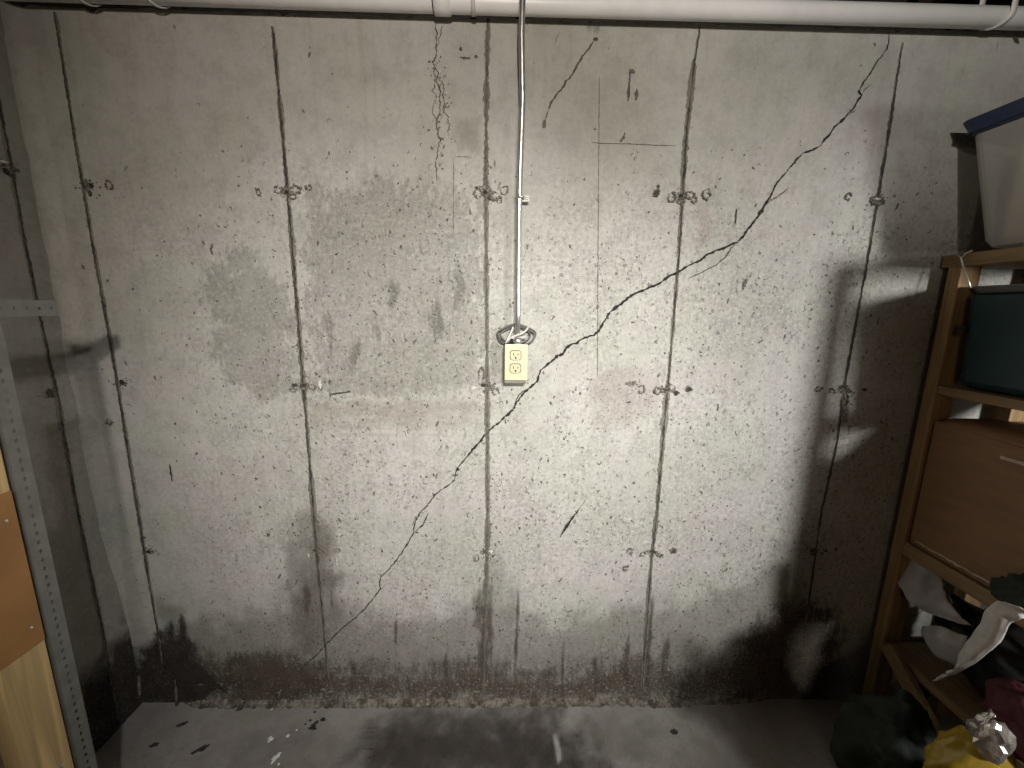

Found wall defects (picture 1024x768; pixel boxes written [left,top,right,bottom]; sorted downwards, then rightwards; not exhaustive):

crack [300,21,890,669]
water stain [74,596,839,768]